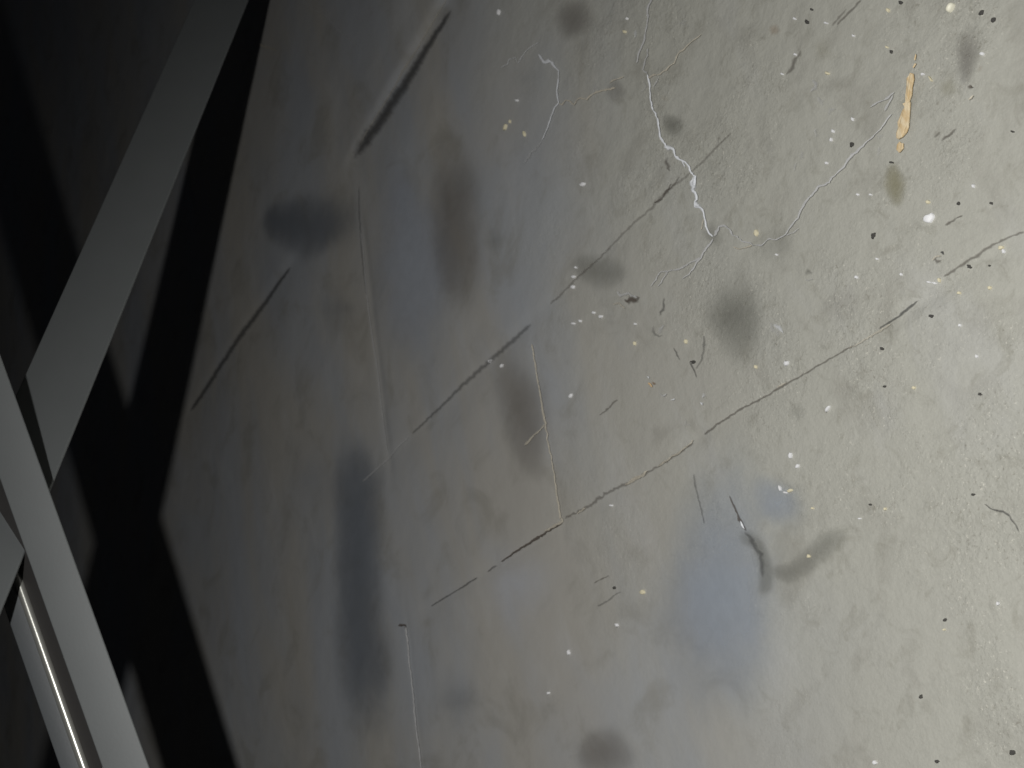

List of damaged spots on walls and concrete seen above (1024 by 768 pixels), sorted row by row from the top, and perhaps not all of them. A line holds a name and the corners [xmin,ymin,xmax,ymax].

crack [539,0,894,286]
crack [880,302,916,328]
crack [501,344,585,562]
crack [729,496,745,529]